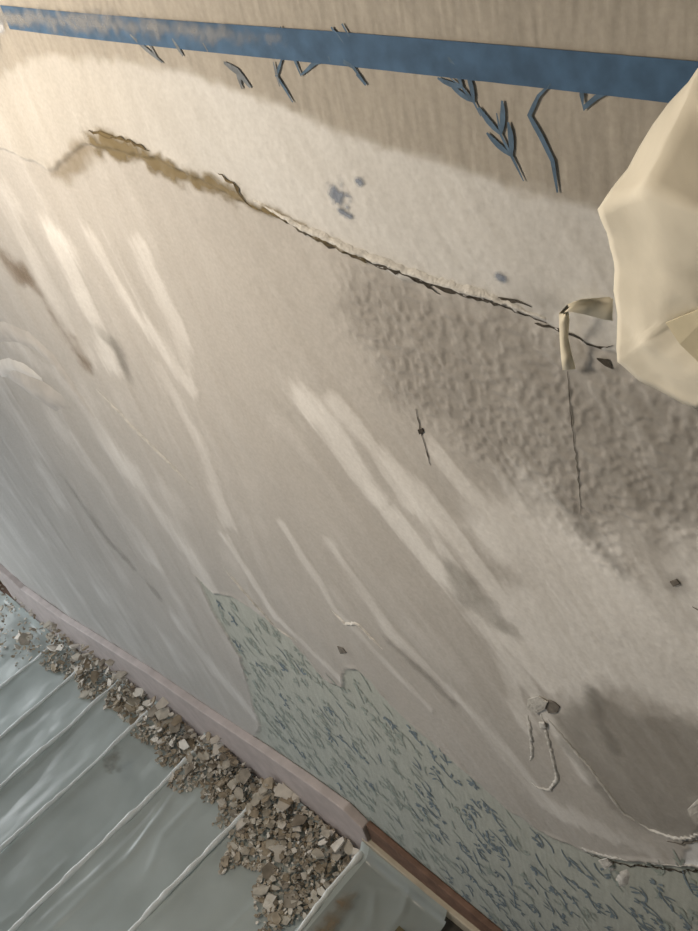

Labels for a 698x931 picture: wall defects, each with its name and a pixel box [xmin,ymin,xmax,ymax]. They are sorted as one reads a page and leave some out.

crack [253,199,613,369]
crack [416,411,431,466]
crack [567,371,581,506]
flaking render [526,696,560,728]
peeling [579,847,698,874]
peeling [637,823,698,846]